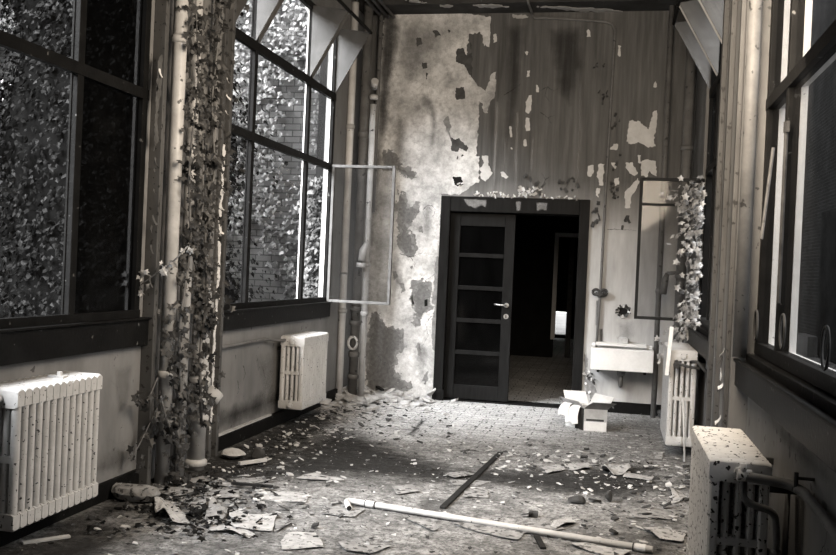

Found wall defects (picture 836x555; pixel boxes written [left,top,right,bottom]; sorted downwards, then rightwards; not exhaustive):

flaking render [364,4,580,398]
peeling [587,110,657,230]
spalling [615,304,631,318]
spalling [582,354,597,399]